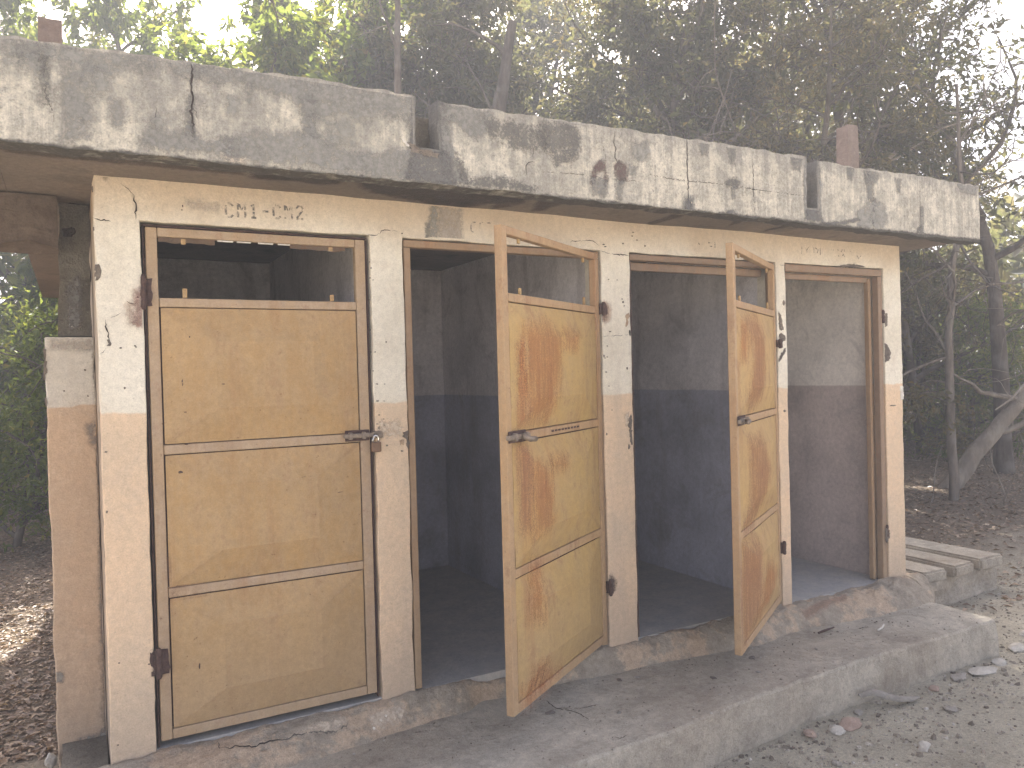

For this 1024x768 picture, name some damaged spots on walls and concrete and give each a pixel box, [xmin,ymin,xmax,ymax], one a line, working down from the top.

crack [189,66,197,136]
damp [2,39,582,238]
corrosion [590,160,637,201]
crack [526,135,804,211]
damp [648,196,696,225]
damp [726,177,741,225]
damp [791,157,887,229]
crack [217,723,348,749]